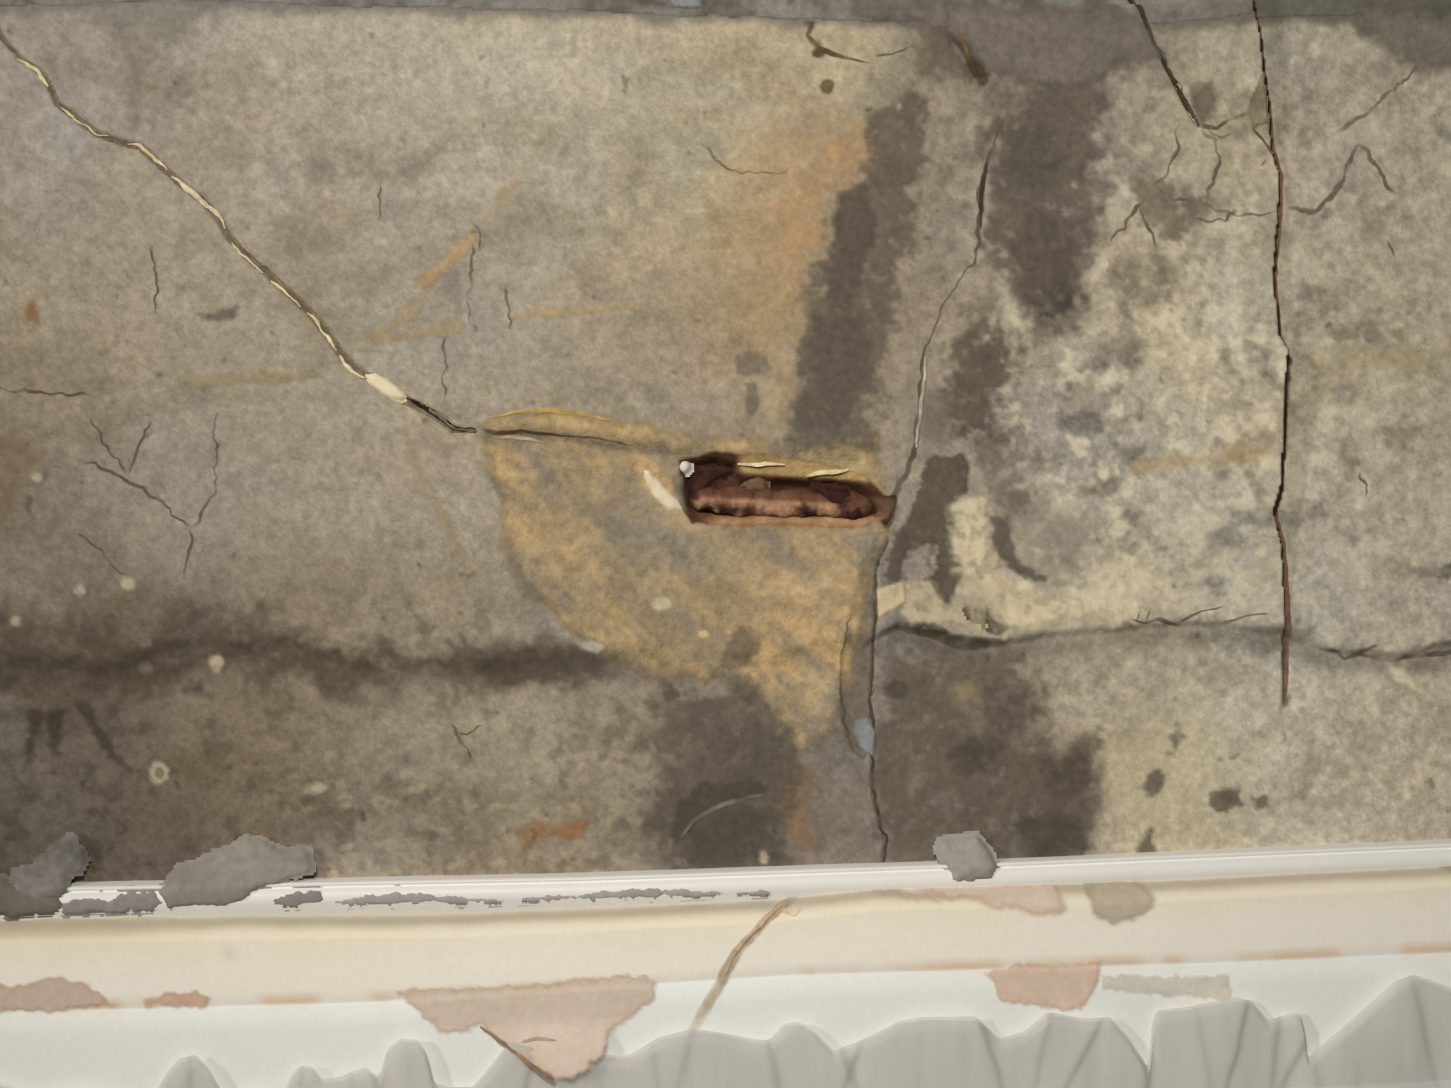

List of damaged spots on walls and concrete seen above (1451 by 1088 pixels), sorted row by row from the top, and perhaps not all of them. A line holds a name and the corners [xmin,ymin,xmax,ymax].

crack [807,22,906,93]
crack [0,31,476,436]
leakage [788,94,925,448]
leakage [980,82,1106,332]
leakage [944,329,1024,457]
crack [1112,0,1413,702]
corrosion [673,476,685,507]
crack [841,112,1014,862]
peeling [0,977,106,1012]
peeling [145,991,208,1007]
peeling [398,975,654,1082]
peeling [989,963,1230,1010]